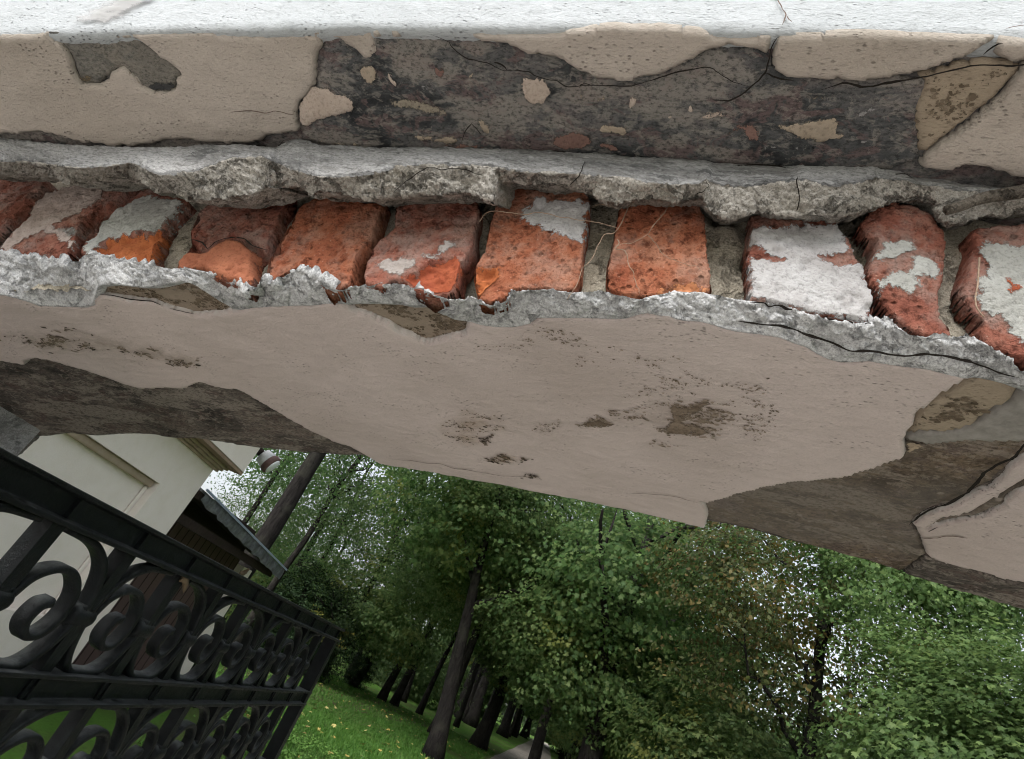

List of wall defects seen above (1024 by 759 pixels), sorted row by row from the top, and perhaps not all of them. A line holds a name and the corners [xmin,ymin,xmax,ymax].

crack [433,0,794,102]
crack [821,25,1024,90]
peeling [0,31,1024,231]
crack [739,302,1017,378]
spalling [0,229,1024,609]
water stain [575,353,779,447]
crack [909,444,1024,539]